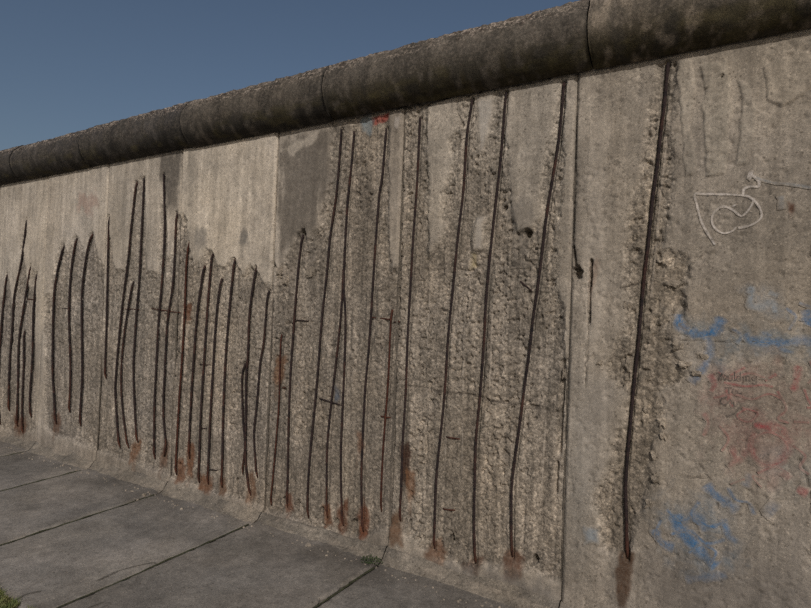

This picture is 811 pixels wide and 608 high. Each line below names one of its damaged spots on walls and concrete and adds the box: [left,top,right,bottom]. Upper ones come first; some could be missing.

leakage [578,103,616,347]
leakage [649,139,669,298]
spalling [0,73,578,584]
spalling [589,58,709,559]
corrosion [156,439,229,500]
corrosion [320,494,372,541]
corrosion [388,440,418,551]
leakage [567,367,631,506]
corrosion [612,548,637,608]